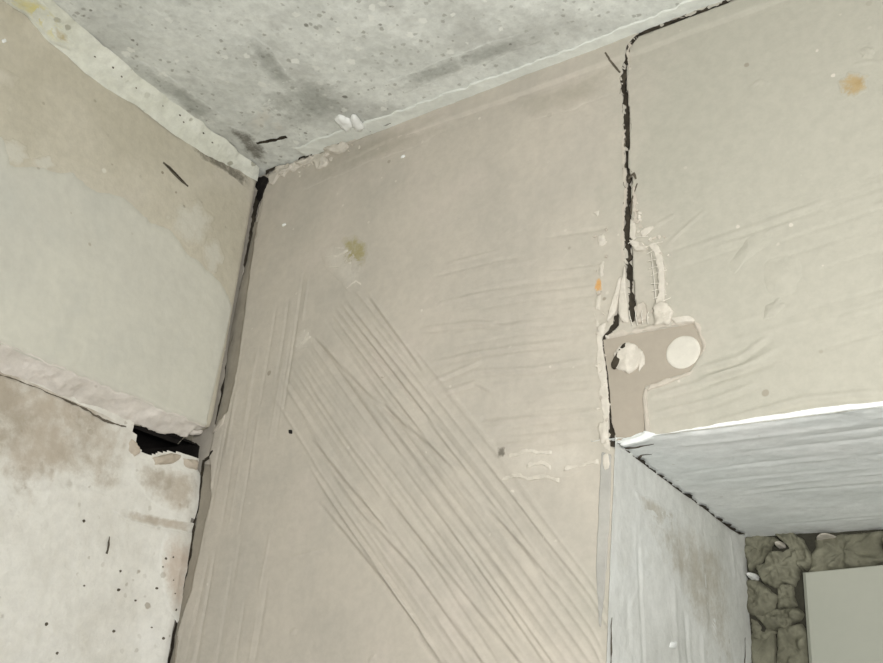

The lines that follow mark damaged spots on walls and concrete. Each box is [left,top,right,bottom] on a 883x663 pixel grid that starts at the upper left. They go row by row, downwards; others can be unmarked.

corrosion [837,71,870,99]
peeling [0,137,258,435]
crack [239,176,269,289]
leakage [341,233,370,278]
crack [602,0,744,535]
crack [215,340,232,424]
leakage [0,372,200,623]
spalling [129,439,140,456]
crack [183,450,213,589]
crack [168,620,178,663]